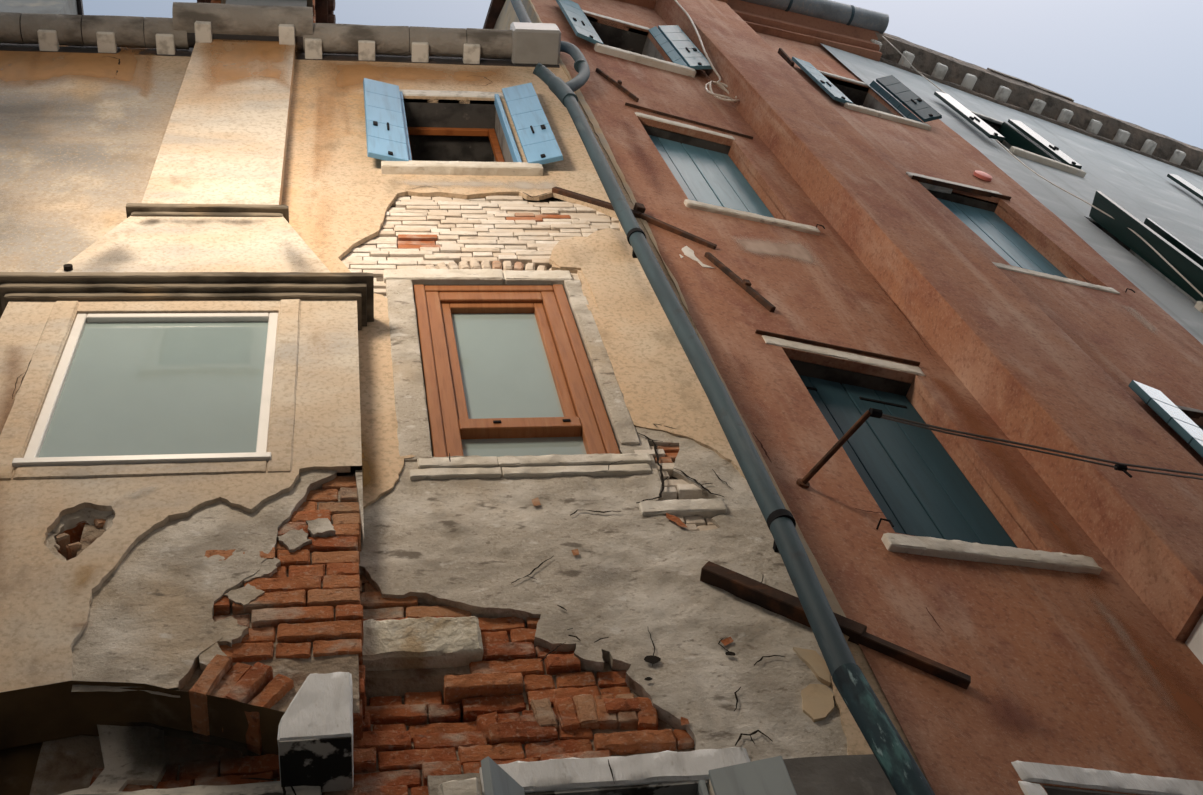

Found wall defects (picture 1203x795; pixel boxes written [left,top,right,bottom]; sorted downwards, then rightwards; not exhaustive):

flaking render [341,196,620,298]
crack [570,424,734,515]
flaking render [30,427,848,795]